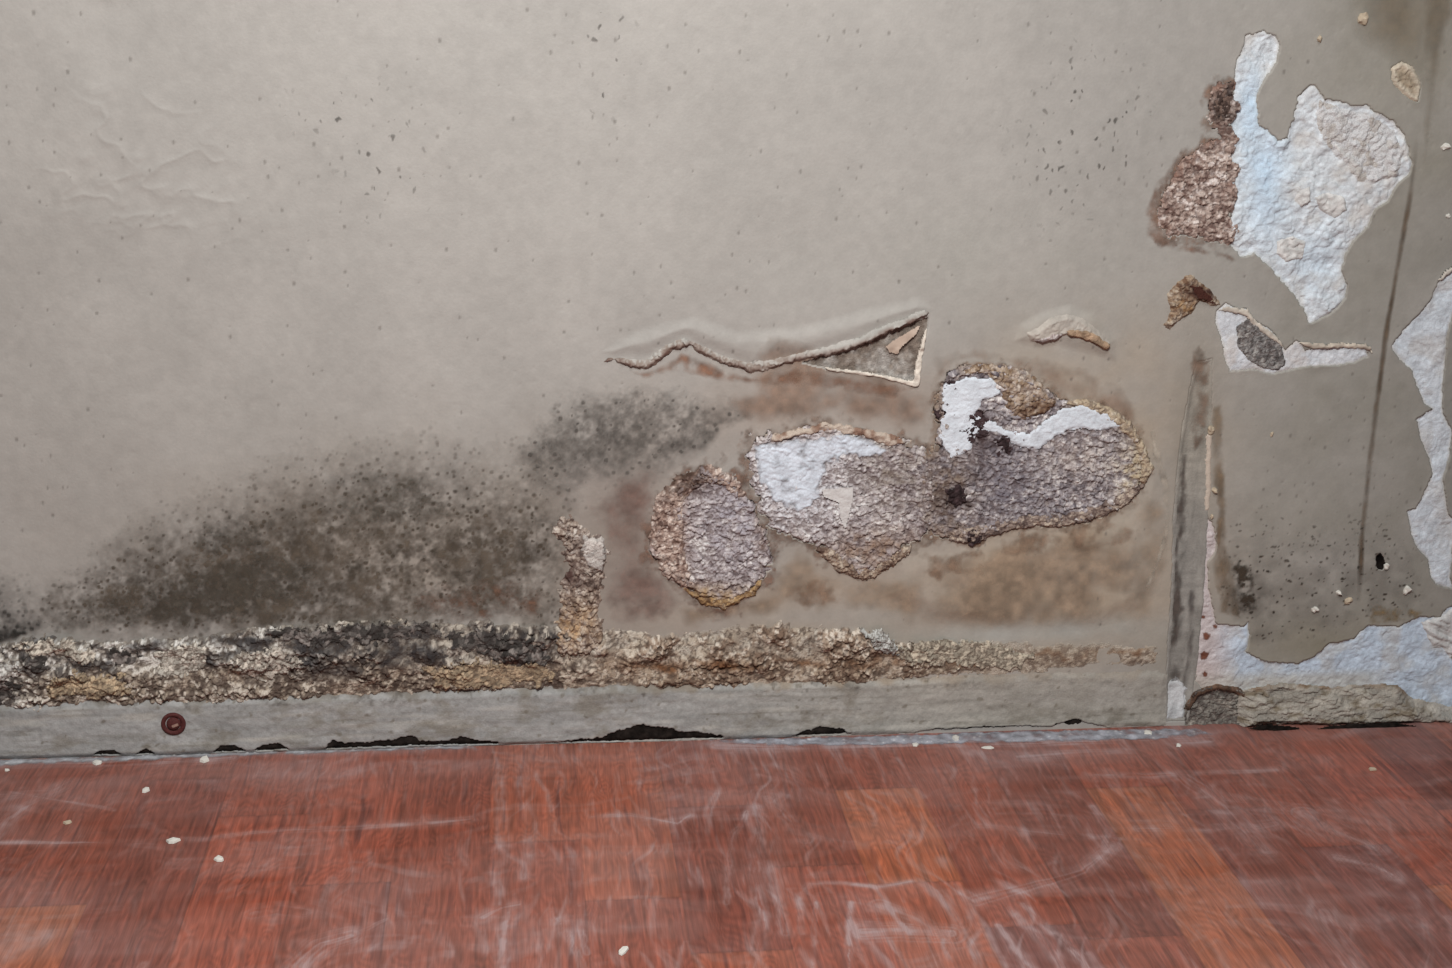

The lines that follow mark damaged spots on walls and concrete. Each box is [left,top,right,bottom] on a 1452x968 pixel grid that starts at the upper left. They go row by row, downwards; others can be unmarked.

flaking render [1154,30,1412,323]
flaking render [1391,61,1421,102]
leakage [0,358,1158,712]
spalling [604,310,1155,615]
flaking render [1215,303,1372,374]
flaking render [1184,519,1452,727]
flaking render [1392,267,1452,588]